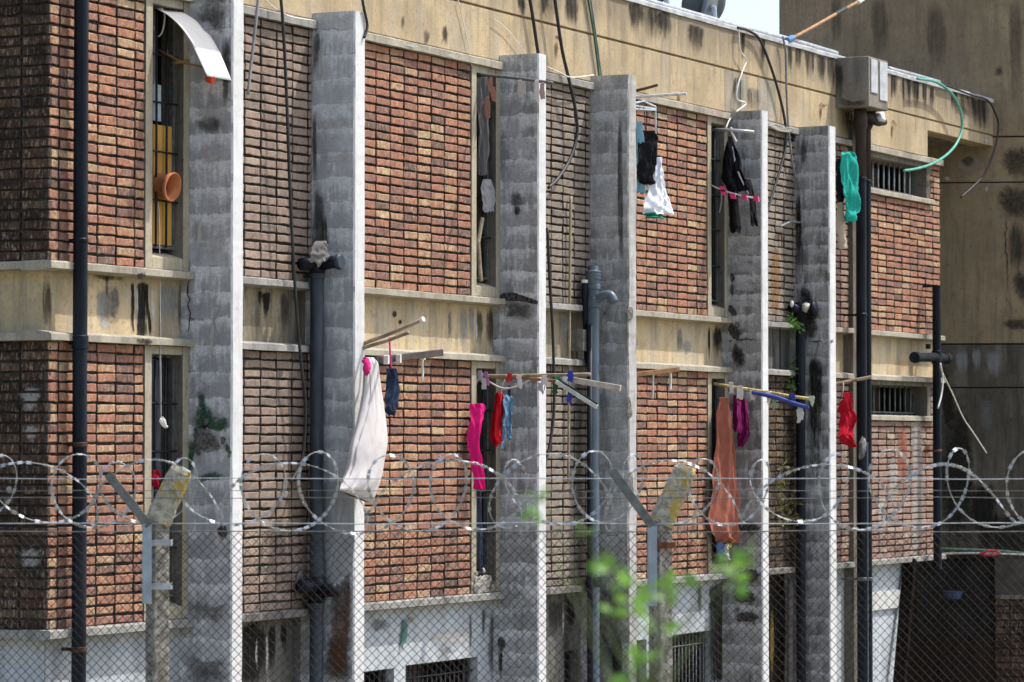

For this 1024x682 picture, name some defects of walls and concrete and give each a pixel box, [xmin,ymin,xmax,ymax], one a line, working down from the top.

water stain [567,0,578,17]
water stain [630,3,670,29]
water stain [690,25,703,45]
water stain [789,48,843,89]
water stain [891,75,934,104]
water stain [952,92,988,120]
water stain [795,197,823,268]
water stain [96,275,118,328]
water stain [131,273,181,344]
crack [187,261,196,370]
water stain [708,328,744,365]
water stain [801,287,822,477]